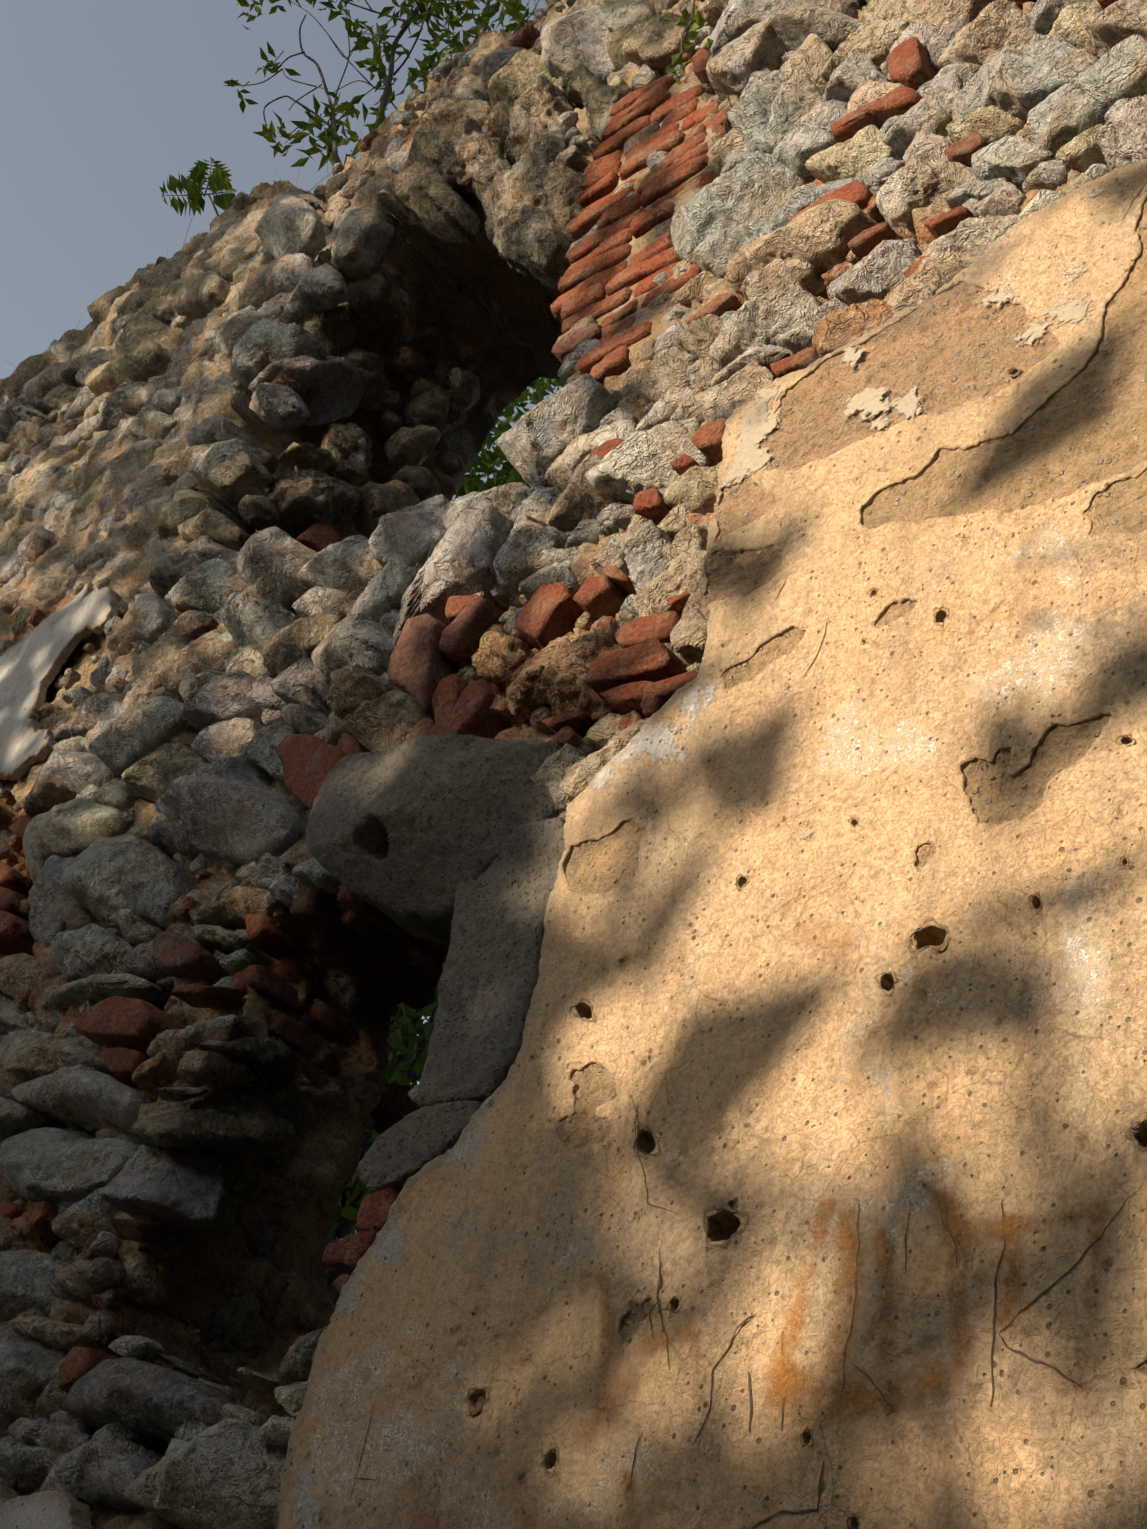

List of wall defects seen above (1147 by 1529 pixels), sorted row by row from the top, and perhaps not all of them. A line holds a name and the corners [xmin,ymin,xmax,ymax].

flaking render [699,201,1147,612]
flaking render [722,627,806,690]
flaking render [962,715,1111,826]
flaking render [916,844,936,870]
flaking render [548,1063,617,1155]
crack [905,1201,957,1275]
flaking render [619,1298,656,1358]
crack [839,1209,890,1411]
crack [990,1197,1128,1407]